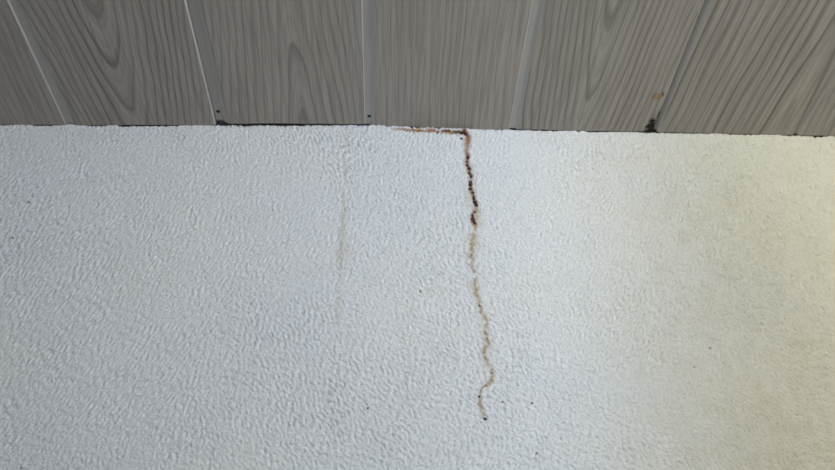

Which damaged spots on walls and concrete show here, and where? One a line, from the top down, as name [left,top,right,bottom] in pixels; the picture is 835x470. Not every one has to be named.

crack [460,129,493,420]